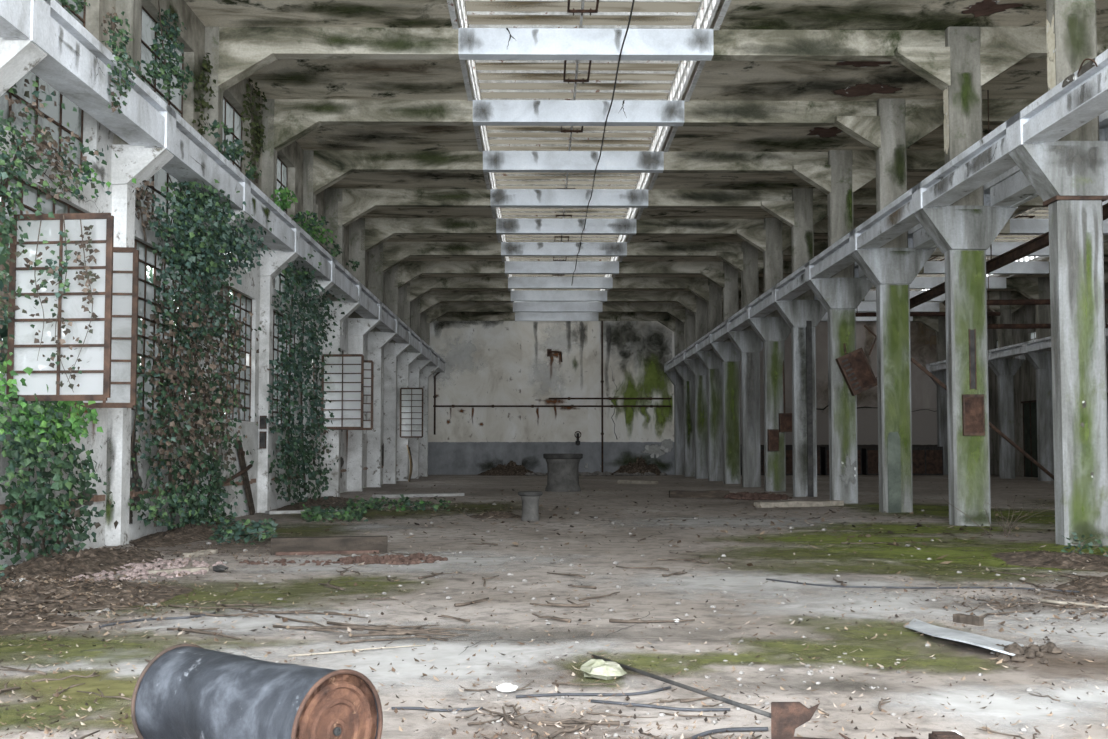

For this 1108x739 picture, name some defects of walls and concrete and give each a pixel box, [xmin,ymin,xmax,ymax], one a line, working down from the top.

damp [311,5,440,51]
damp [266,71,317,84]
damp [306,103,343,113]
damp [398,105,450,132]
damp [701,80,854,118]
damp [960,73,977,110]
damp [751,137,845,150]
damp [414,151,469,178]
damp [682,182,802,201]
damp [1067,210,1098,297]
damp [607,323,667,377]
damp [611,397,673,432]